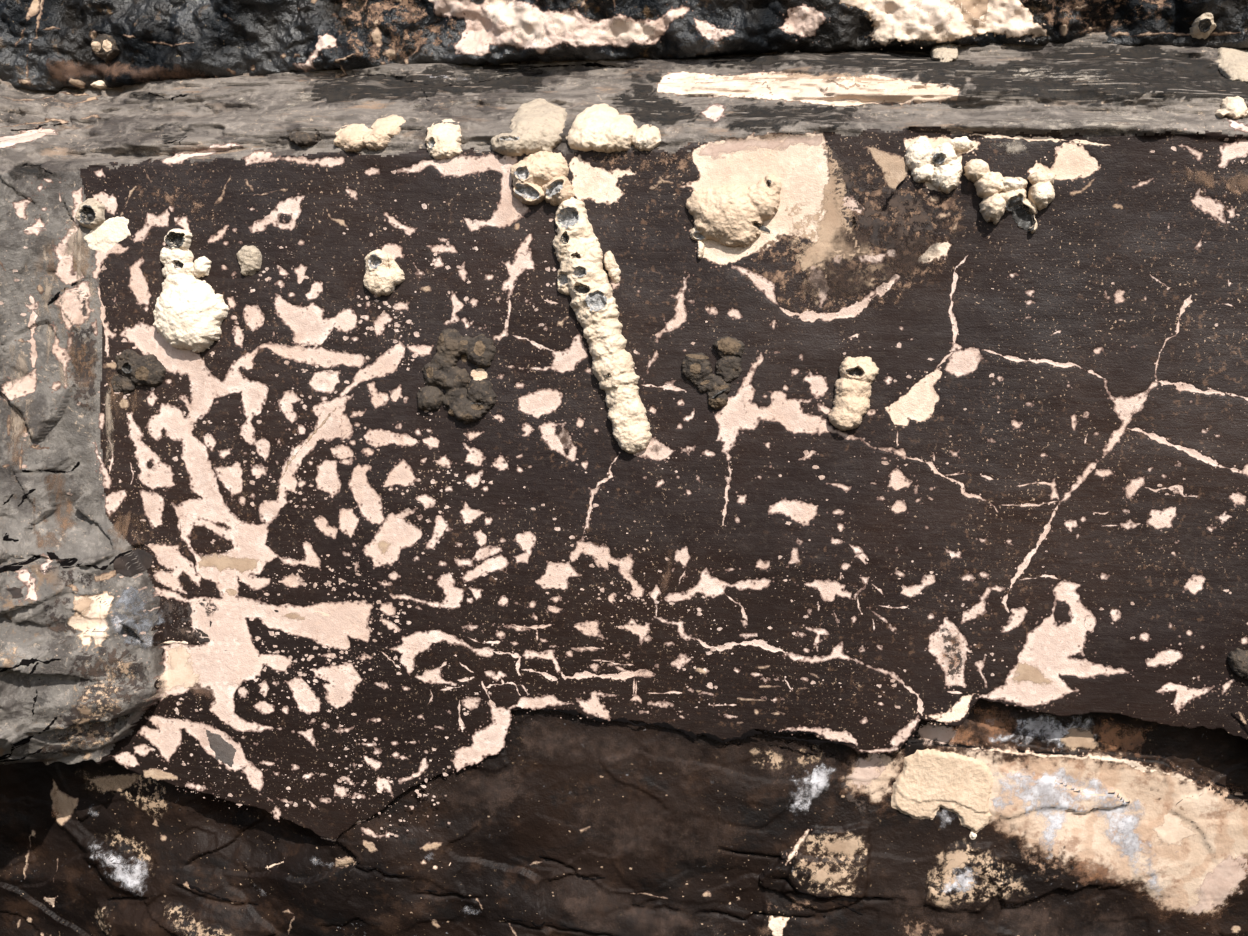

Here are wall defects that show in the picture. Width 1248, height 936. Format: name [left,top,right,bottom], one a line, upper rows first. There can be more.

peeling [419,0,736,57]
peeling [839,0,1054,50]
peeling [680,125,861,268]
crack [860,255,1248,613]
crack [0,462,145,573]
peeling [0,150,938,880]
crack [580,452,621,541]
crack [652,614,1082,757]
efflorescence [90,834,151,890]
leakage [766,901,815,911]
leakage [904,921,943,936]
leakage [993,769,1157,886]